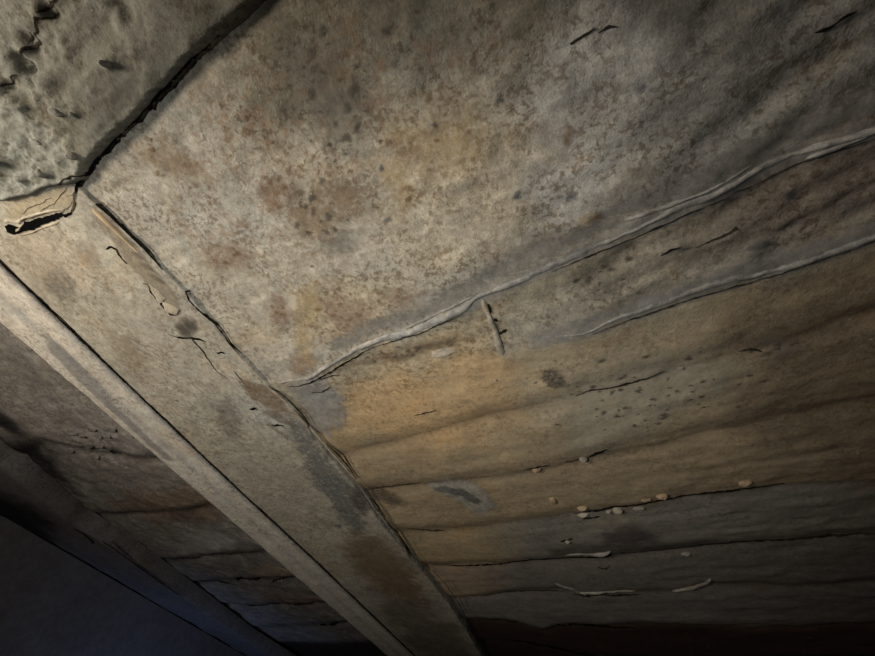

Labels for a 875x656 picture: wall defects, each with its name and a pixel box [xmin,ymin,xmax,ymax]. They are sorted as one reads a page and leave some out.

crack [57,17,238,218]
spalling [3,187,70,237]
crack [0,261,415,656]
damp [292,388,364,536]
damp [428,478,494,514]
crack [143,283,875,656]
damp [555,352,727,449]